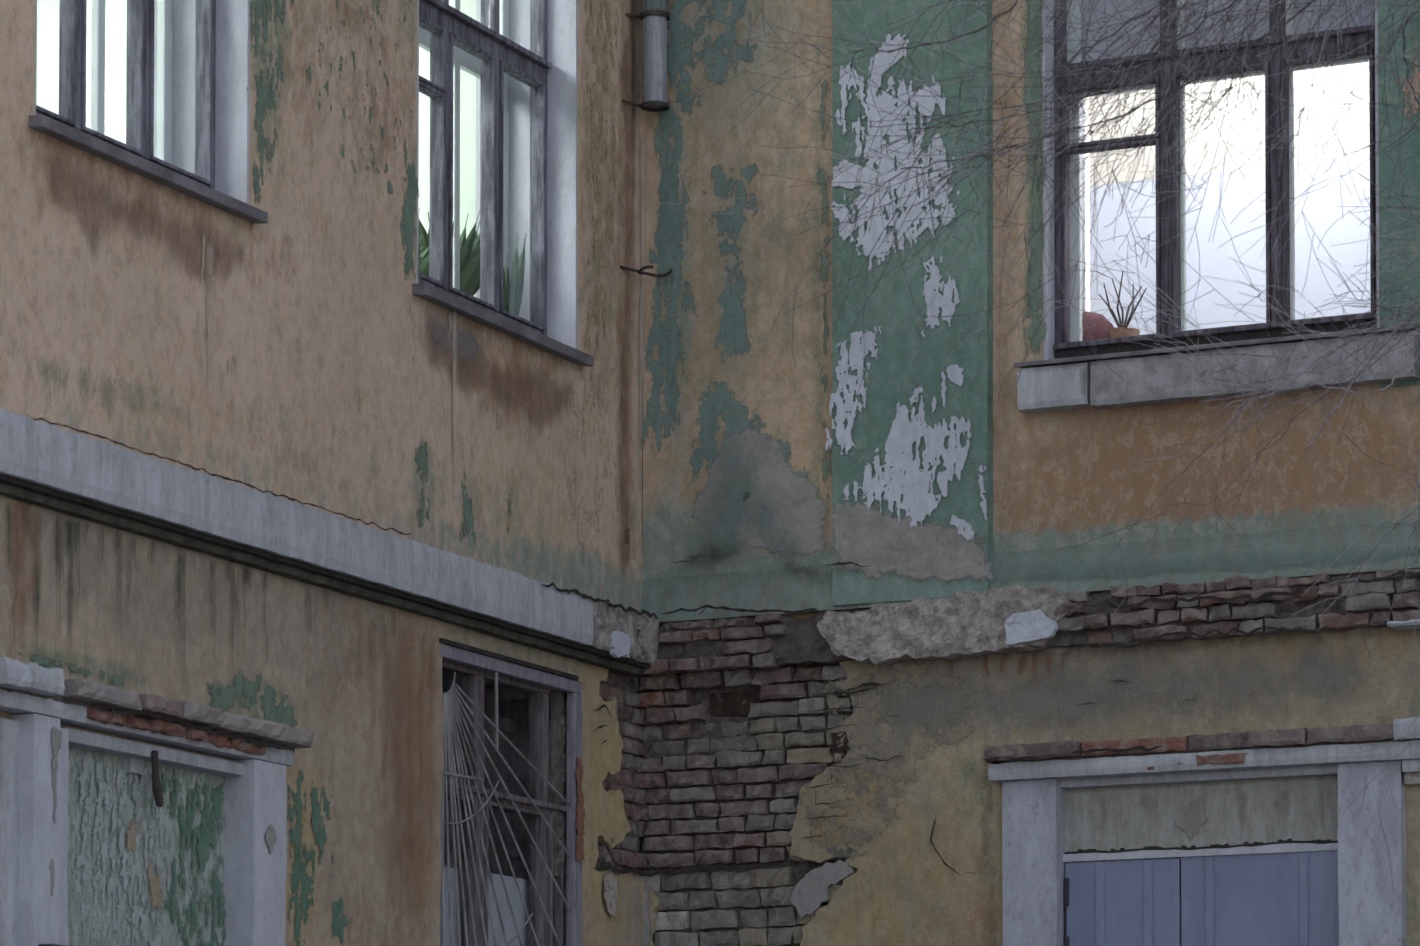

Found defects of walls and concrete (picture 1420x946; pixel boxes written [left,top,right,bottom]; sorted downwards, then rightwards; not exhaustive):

peeling [247,0,294,204]
peeling [306,0,422,280]
spalling [549,0,1420,946]
peeling [207,670,297,727]
peeling [49,726,226,946]
peeling [265,769,347,946]